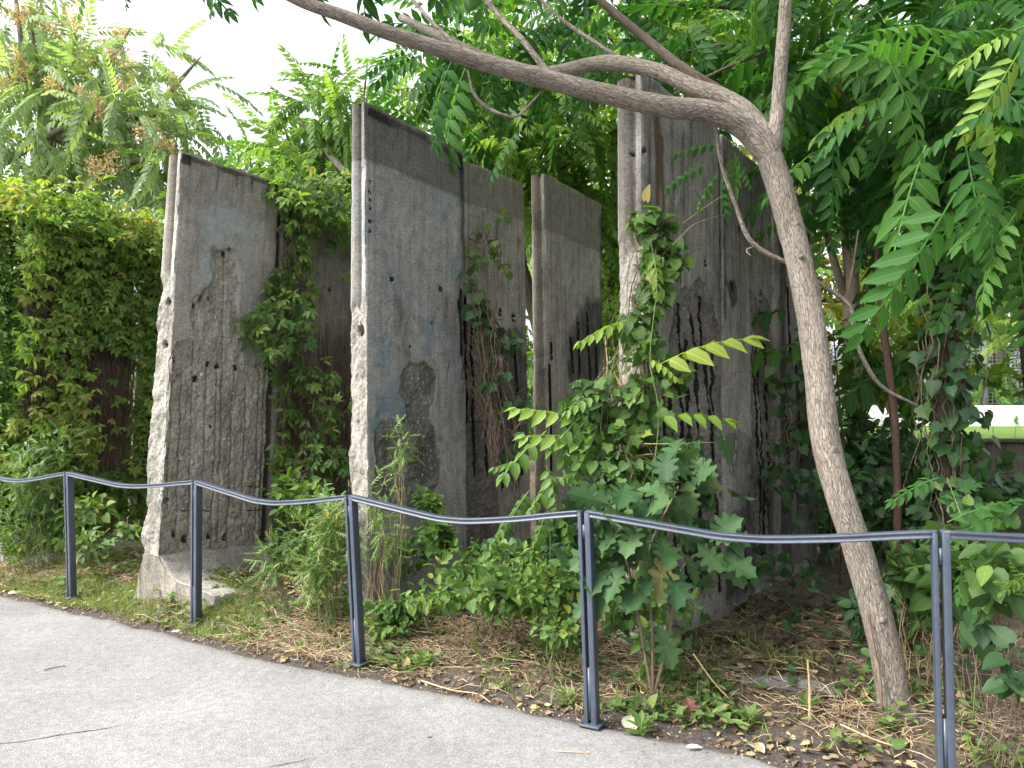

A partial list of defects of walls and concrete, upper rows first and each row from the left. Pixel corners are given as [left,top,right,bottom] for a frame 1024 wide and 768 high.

spalling [141,246,269,557]
leakage [501,329,527,487]
leakage [569,279,602,390]
leakage [779,239,792,565]
leakage [741,500,754,565]